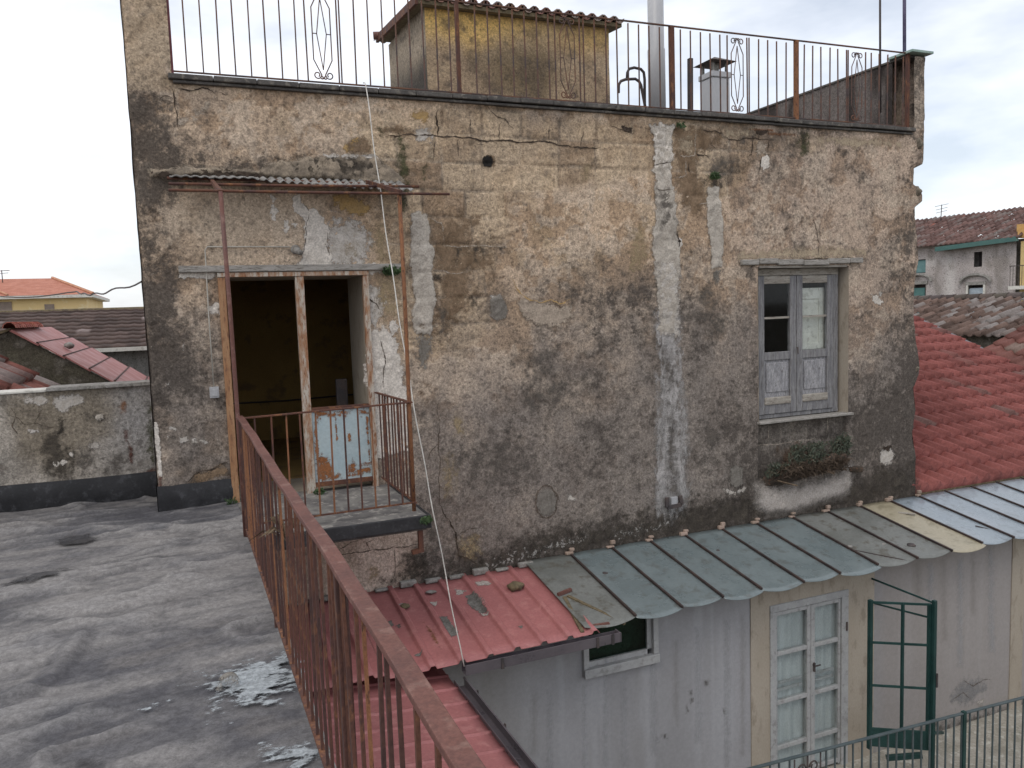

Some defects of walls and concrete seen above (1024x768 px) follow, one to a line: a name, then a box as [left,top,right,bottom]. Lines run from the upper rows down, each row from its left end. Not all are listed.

crack [388,106,600,162]
flaking render [269,194,408,459]
leakage [699,278,725,347]
leakage [521,345,574,411]
corrosion [313,408,372,482]
crack [428,413,478,565]
leakage [370,457,921,588]
spalling [880,445,895,466]